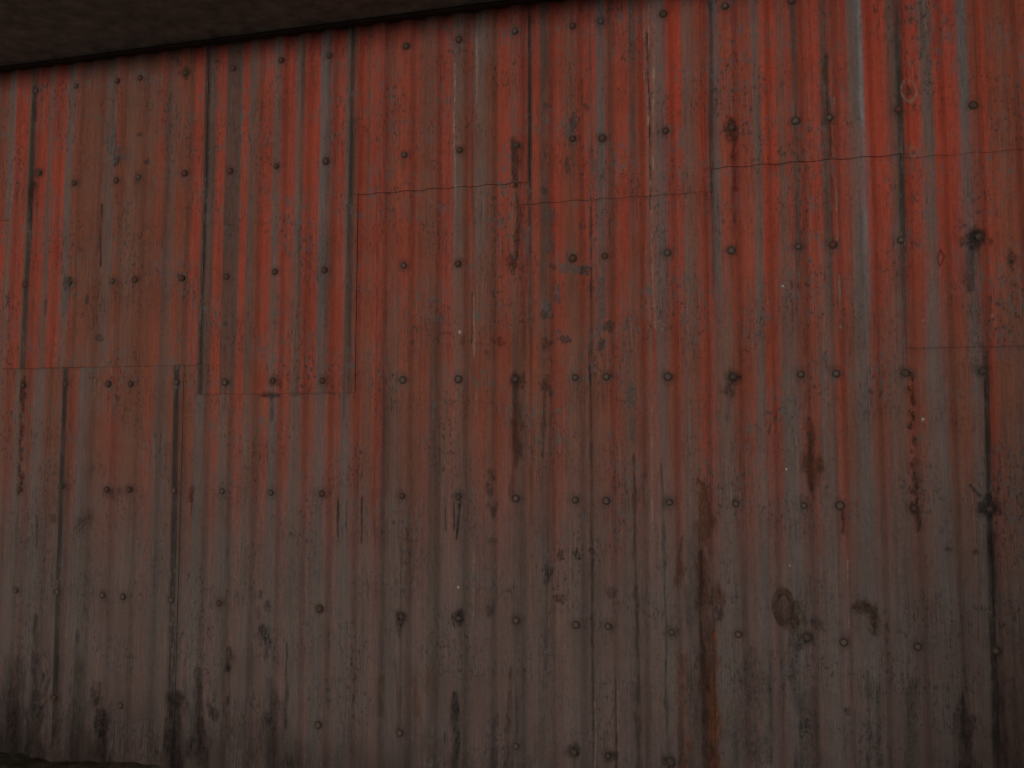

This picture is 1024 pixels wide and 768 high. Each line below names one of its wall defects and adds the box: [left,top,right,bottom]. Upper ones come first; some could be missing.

rust [677,482,723,768]